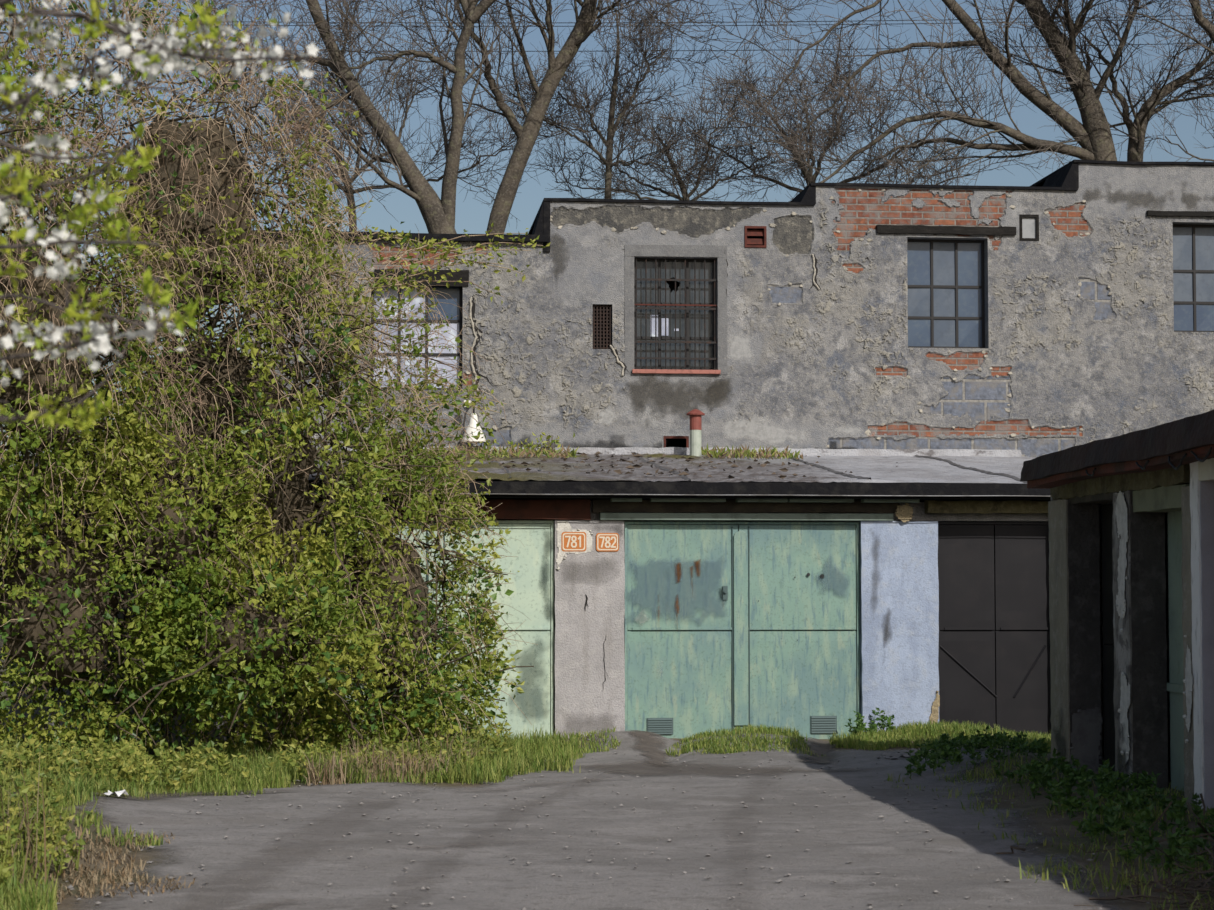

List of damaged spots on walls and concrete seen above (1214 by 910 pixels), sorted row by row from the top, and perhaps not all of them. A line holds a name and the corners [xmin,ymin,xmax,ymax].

flaking render [829,188,1016,274]
flaking render [1044,200,1093,237]
flaking render [926,350,1012,381]
flaking render [865,394,1084,440]
rust [675,560,701,613]
peeling [1115,491,1128,632]